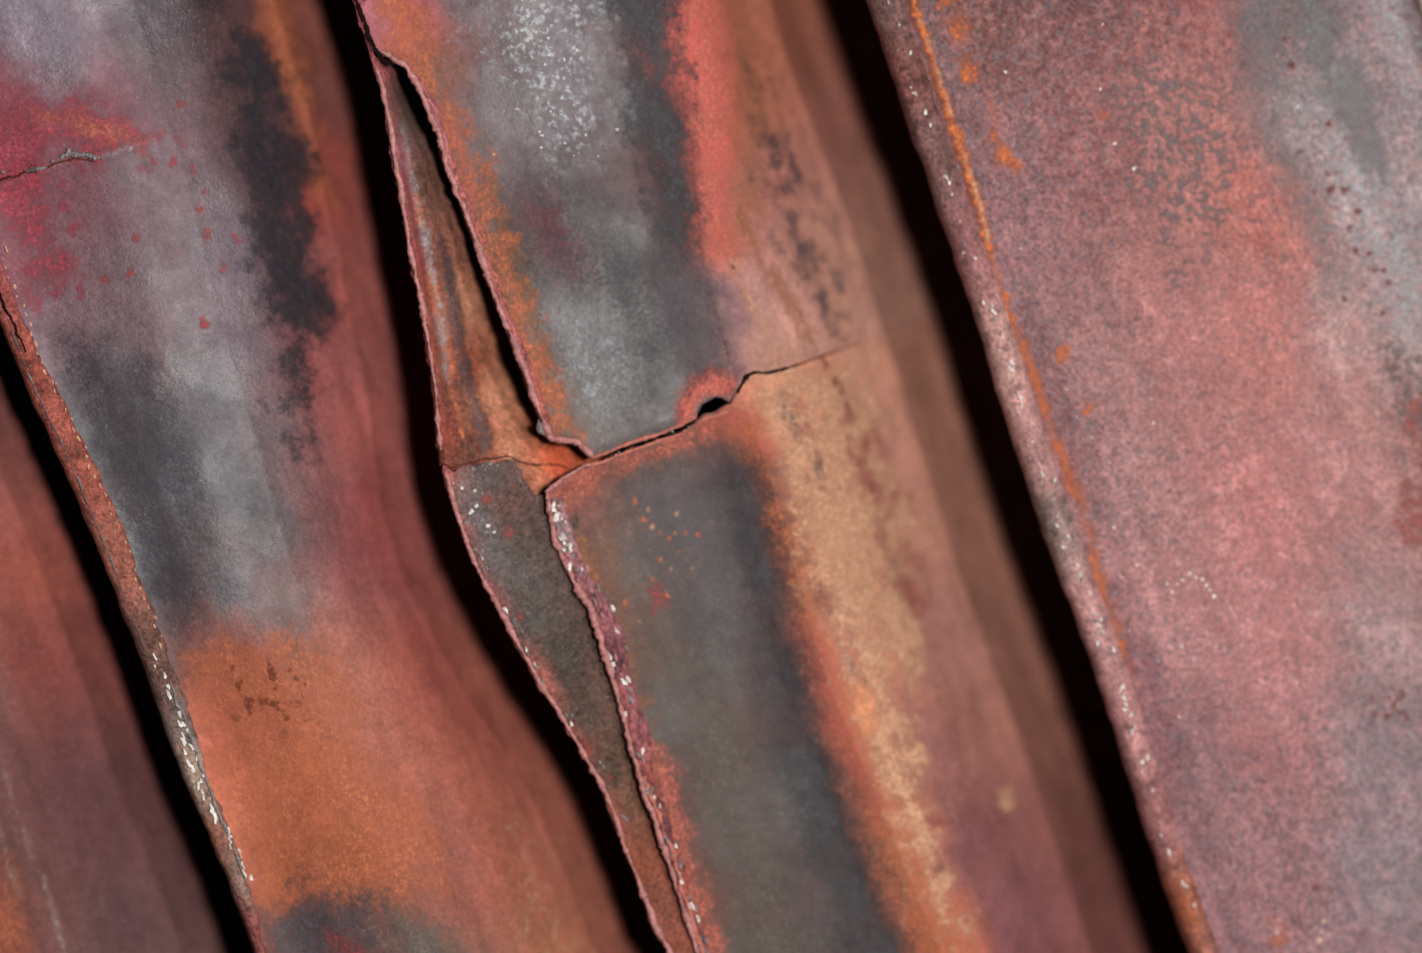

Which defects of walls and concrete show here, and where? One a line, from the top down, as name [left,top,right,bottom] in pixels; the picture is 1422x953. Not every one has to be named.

crack [0,292,26,353]
crack [0,139,155,181]
corrosion [0,89,177,311]
corrosion [374,0,585,453]
crack [439,418,697,492]
corrosion [548,417,728,511]
crack [737,344,858,407]
corrosion [906,0,1087,507]
corrosion [1101,3,1251,290]
corrosion [444,470,673,953]
corrosion [755,348,973,953]
corrosion [650,739,725,953]